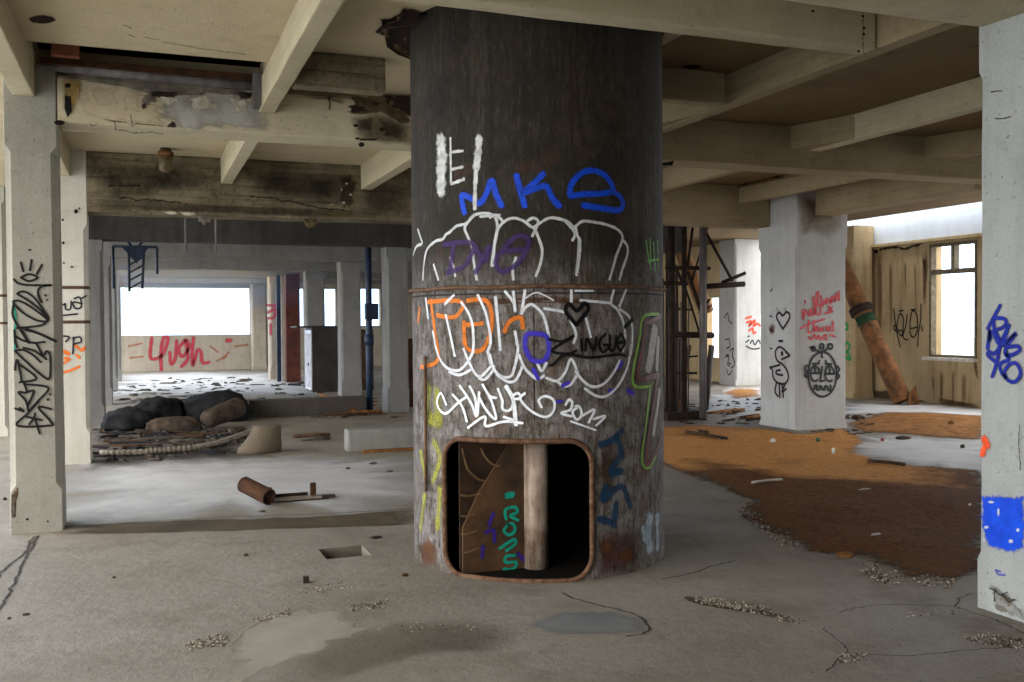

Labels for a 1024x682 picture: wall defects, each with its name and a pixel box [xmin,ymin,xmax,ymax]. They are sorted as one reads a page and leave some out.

spalling [376,9,426,59]
peeling [62,73,264,130]
spalling [348,95,411,123]
water stain [357,116,407,142]
crack [108,185,180,203]
water stain [145,204,338,216]
crack [250,196,353,212]
crack [0,535,39,609]
crack [563,593,652,637]
crack [823,587,1024,671]